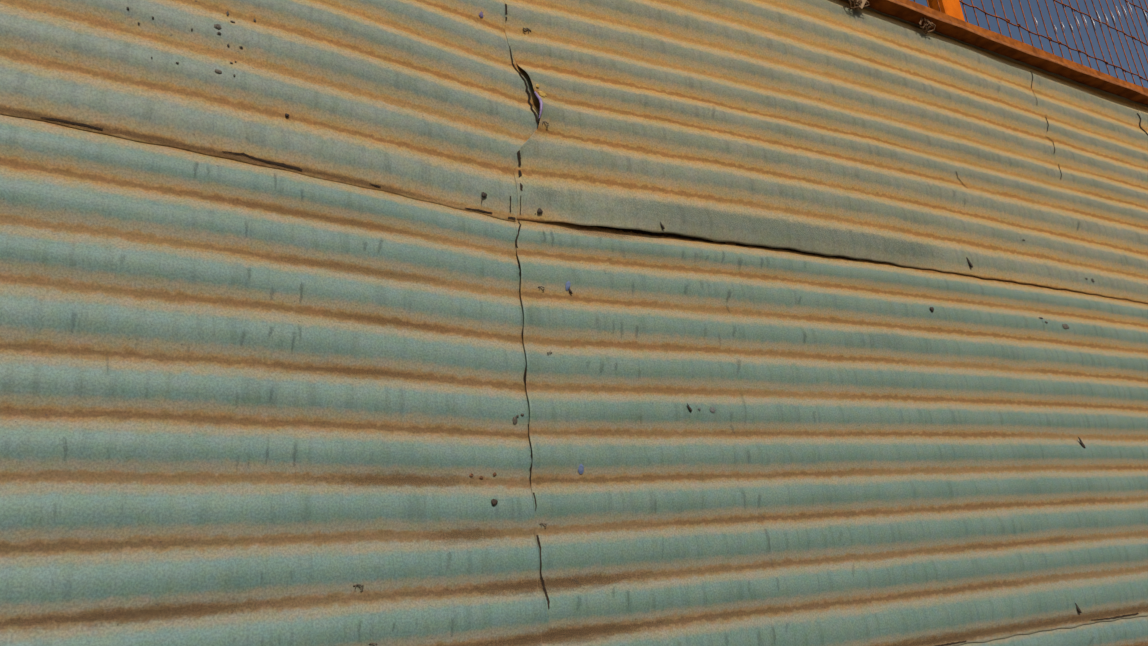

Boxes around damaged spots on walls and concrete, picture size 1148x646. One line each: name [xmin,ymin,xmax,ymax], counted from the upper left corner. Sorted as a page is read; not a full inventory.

crack [505,4,539,126]
crack [41,117,103,130]
crack [222,151,302,171]
crack [466,150,536,291]
crack [592,226,886,263]
crack [522,323,550,608]
crack [1094,612,1139,620]